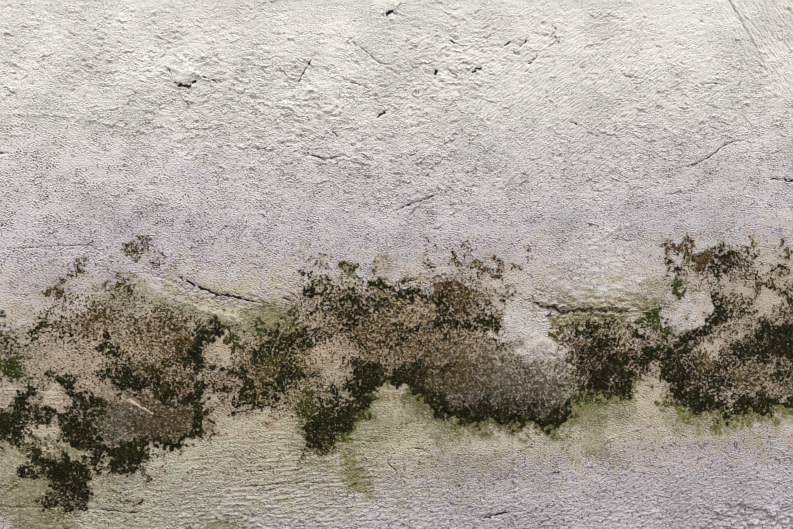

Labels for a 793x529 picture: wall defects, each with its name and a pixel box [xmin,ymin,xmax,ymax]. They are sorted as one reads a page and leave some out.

crack [180,277,261,303]
crack [527,292,645,318]
damp [19,233,793,473]
damp [3,396,60,462]